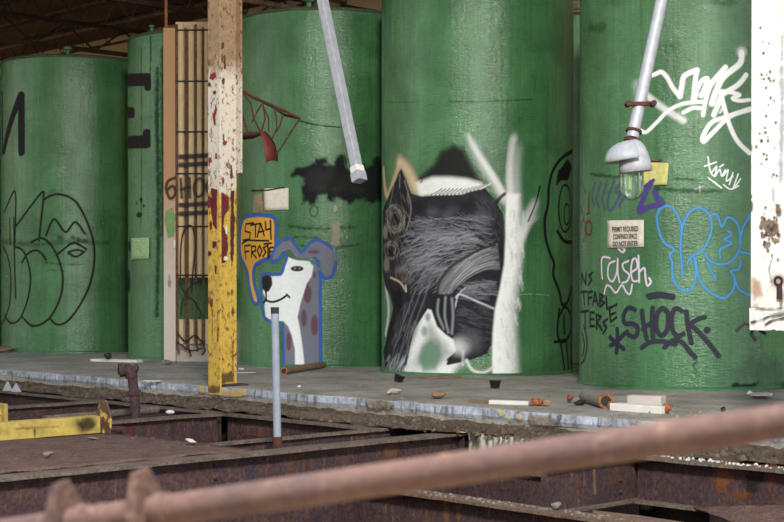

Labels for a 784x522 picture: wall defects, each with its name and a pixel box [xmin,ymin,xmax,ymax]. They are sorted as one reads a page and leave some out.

peeling [207,42,226,94]
peeling [208,163,235,274]
spalling [759,204,781,260]
rust [208,373,234,393]
spalling [498,410,557,427]